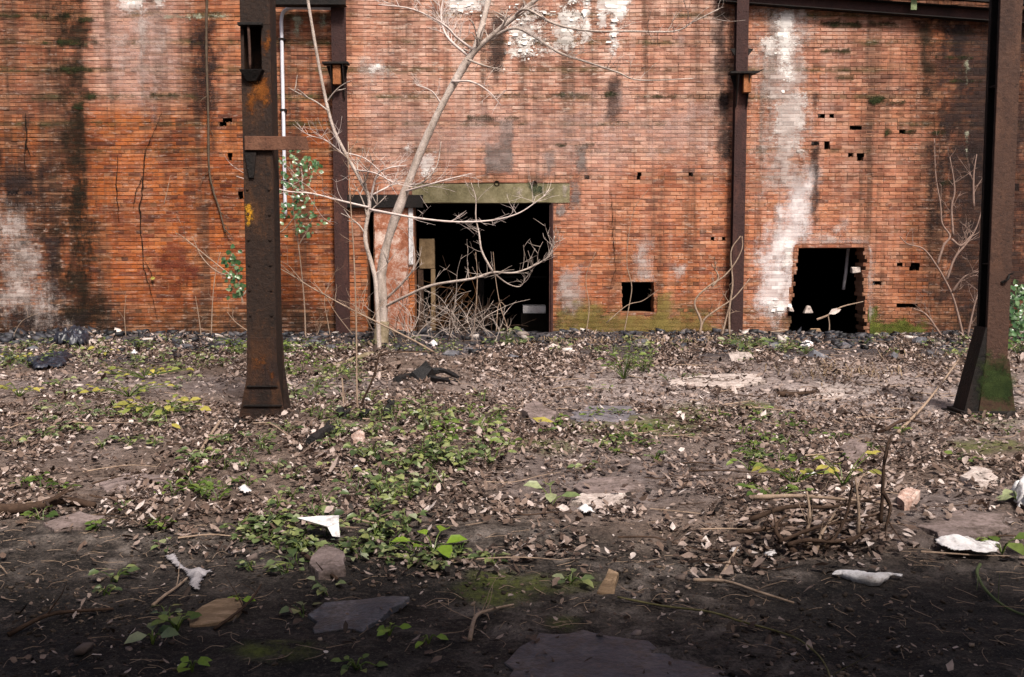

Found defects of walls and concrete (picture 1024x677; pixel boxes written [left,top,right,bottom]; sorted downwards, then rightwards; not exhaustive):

damp [0,1,106,330]
crack [115,114,162,322]
corrosion [247,77,270,115]
peeling [446,0,485,16]
peeling [503,0,631,70]
damp [559,275,580,308]
damp [758,9,820,308]
damp [913,19,988,319]
damp [1010,25,1024,321]